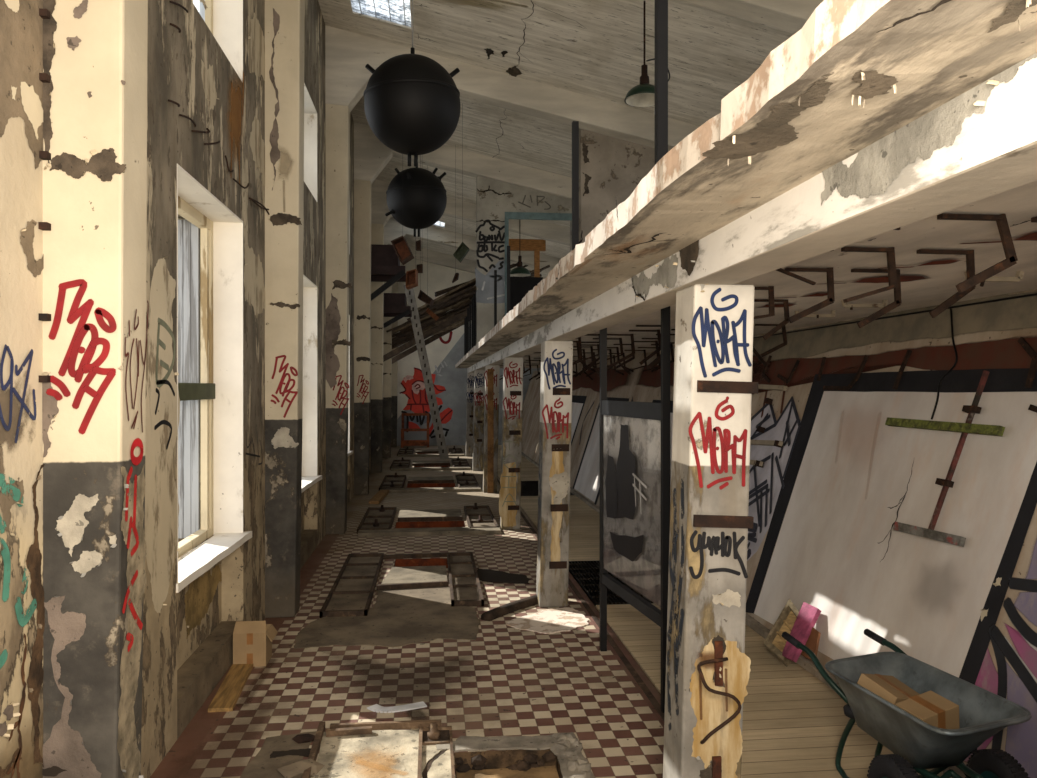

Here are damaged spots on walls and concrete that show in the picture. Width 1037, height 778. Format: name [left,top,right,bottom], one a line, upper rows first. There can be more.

peeling [0,0,126,182]
spalling [266,8,280,190]
crack [509,0,587,75]
crack [876,0,951,33]
peeling [821,53,1037,206]
peeling [20,219,44,278]
spalling [268,213,302,226]
peeling [0,372,102,778]
peeling [55,464,147,778]
corrosion [699,653,728,720]
peeling [689,635,751,778]
crack [880,461,914,562]